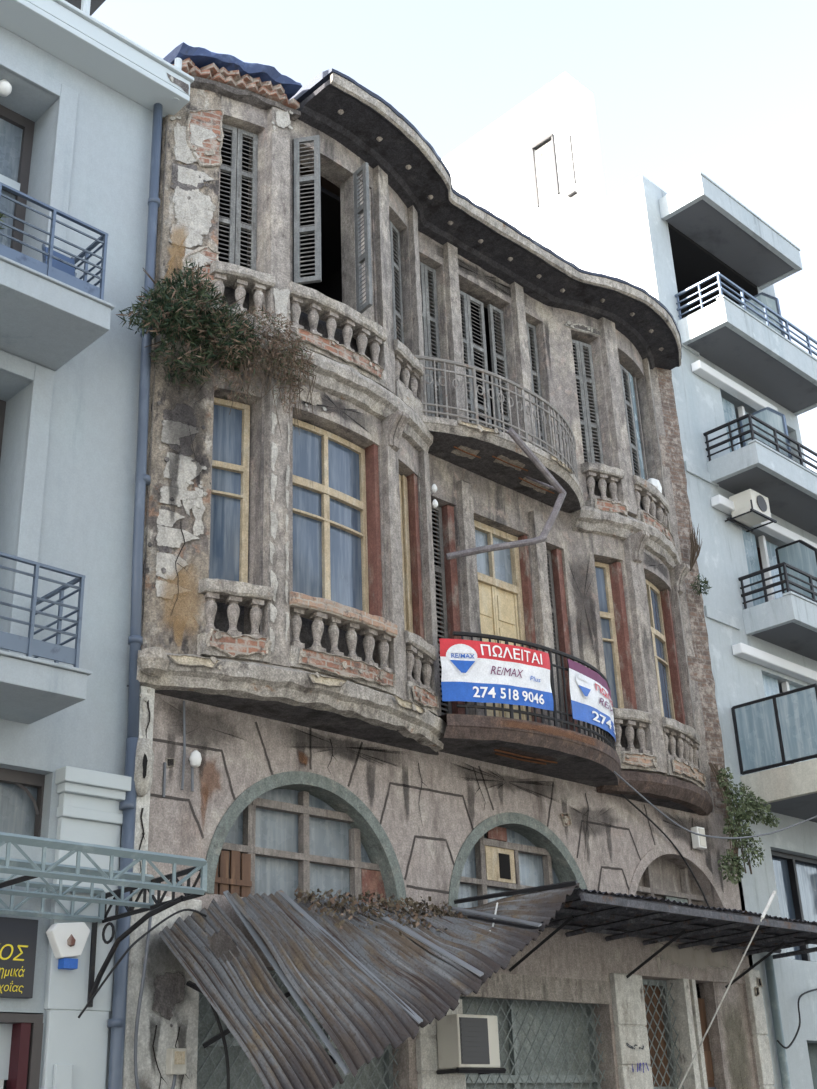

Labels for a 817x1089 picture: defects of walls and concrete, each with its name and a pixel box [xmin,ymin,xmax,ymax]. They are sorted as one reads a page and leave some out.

peeling [167,73,189,95]
peeling [169,108,224,298]
spalling [273,287,385,380]
peeling [295,385,327,412]
peeling [148,401,208,599]
spalling [167,384,290,670]
spalling [299,648,439,715]
damp [150,1024,160,1065]
damp [178,1028,186,1048]